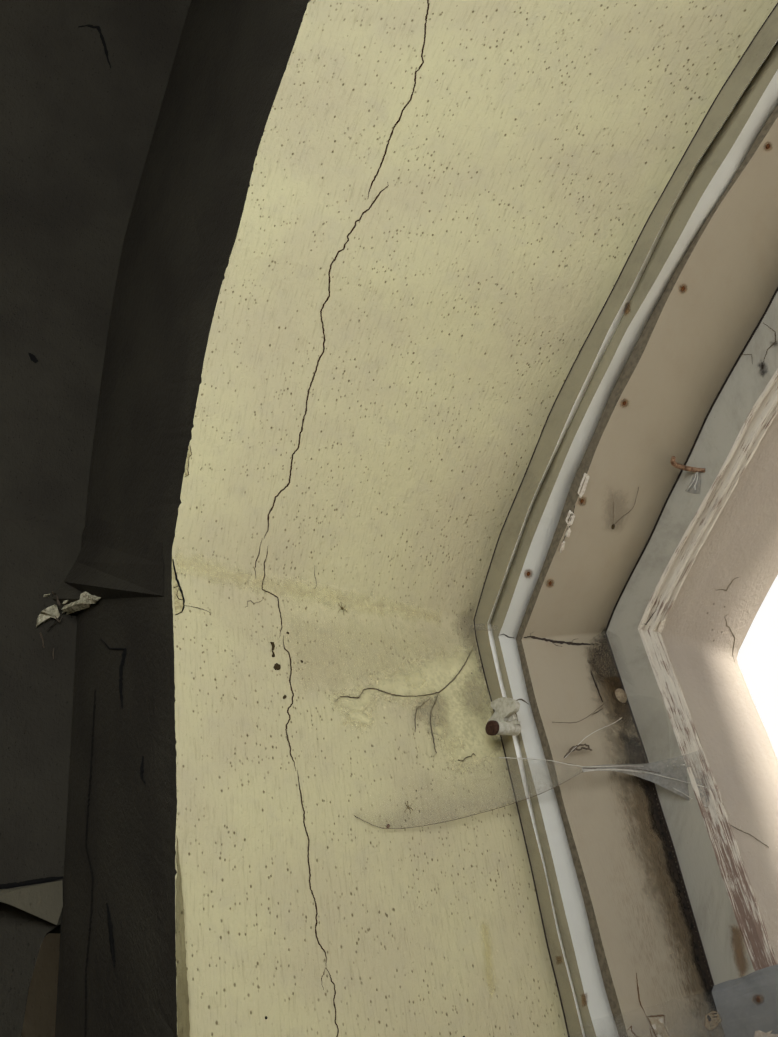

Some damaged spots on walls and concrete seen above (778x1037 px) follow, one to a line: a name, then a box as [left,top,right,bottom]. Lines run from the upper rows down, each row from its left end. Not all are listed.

crack [246,0,429,1037]
flaking render [36,591,102,659]
crack [335,650,476,761]
peeling [338,650,500,764]